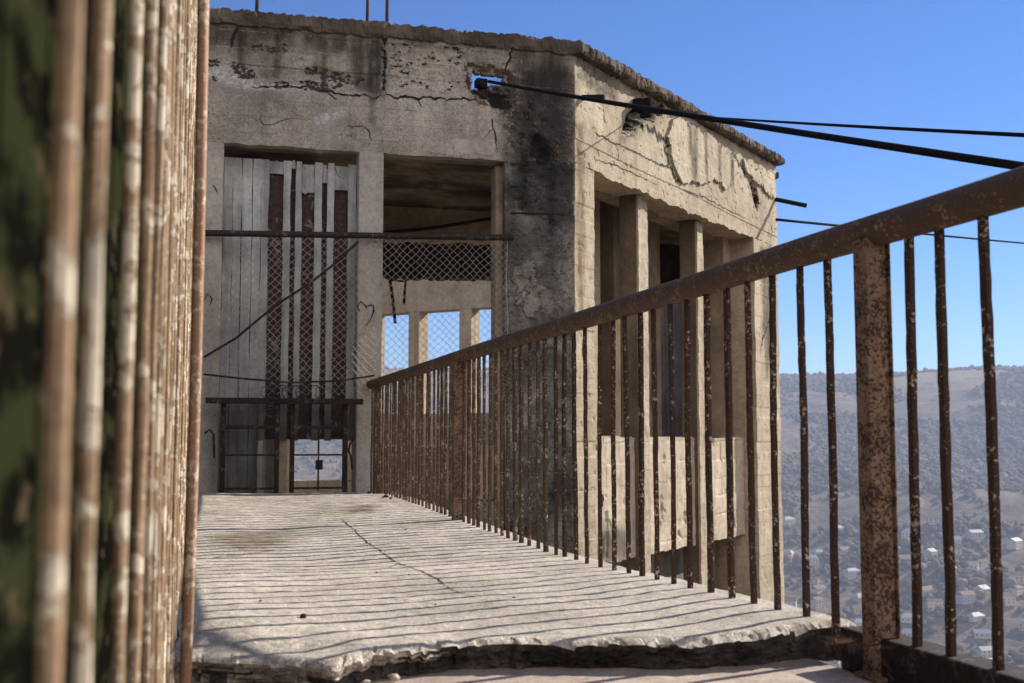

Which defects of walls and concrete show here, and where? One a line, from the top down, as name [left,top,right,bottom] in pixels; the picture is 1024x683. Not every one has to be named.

leakage [209,23,382,91]
crack [251,38,498,151]
spalling [389,41,517,109]
crack [595,120,759,218]
peeling [621,94,777,211]
crack [341,518,493,603]